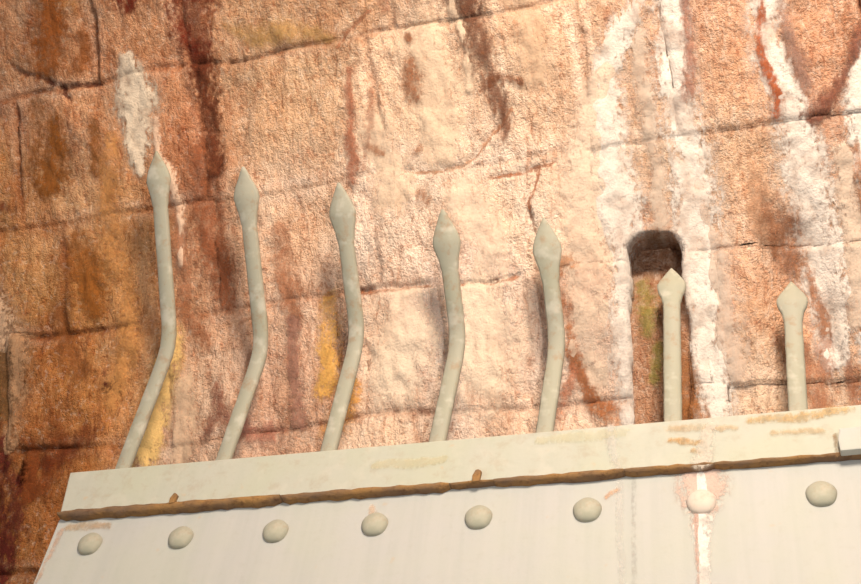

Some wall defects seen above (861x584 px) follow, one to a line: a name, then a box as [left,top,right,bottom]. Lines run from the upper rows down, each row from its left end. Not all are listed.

crack [45,79,103,102]
corrosion [755,0,783,118]
water stain [746,0,861,375]
corrosion [274,224,307,430]
water stain [551,0,752,584]
corrosion [0,420,96,584]
corrosion [203,383,230,437]
corrosion [241,418,280,441]
corrosion [57,435,861,521]